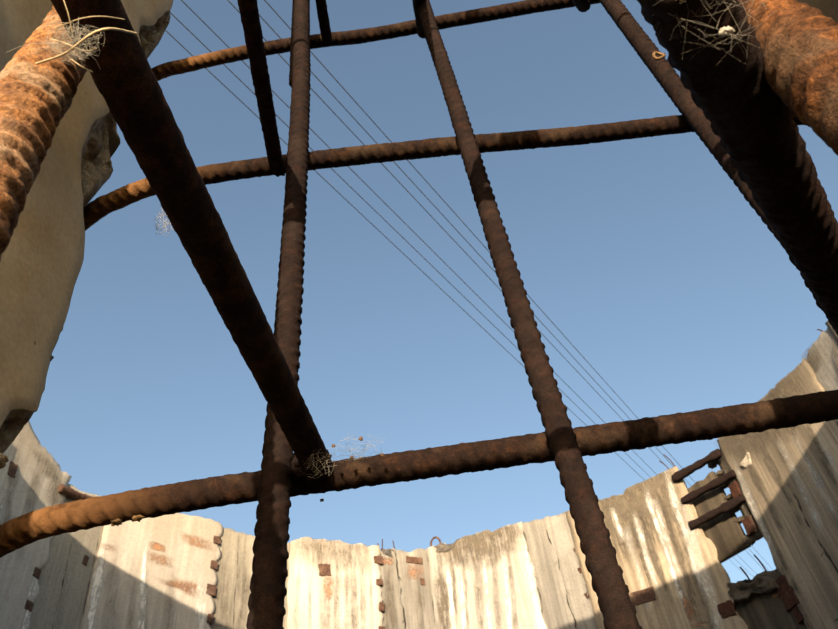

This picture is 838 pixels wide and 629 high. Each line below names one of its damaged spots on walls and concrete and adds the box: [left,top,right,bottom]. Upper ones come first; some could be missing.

spalling [0,0,555,629]
spalling [237,0,838,629]
damp [87,550,104,629]
damp [138,547,147,629]
rust [151,543,166,564]
damp [195,578,206,629]
damp [435,525,518,629]
damp [524,545,547,629]
crack [787,483,838,573]